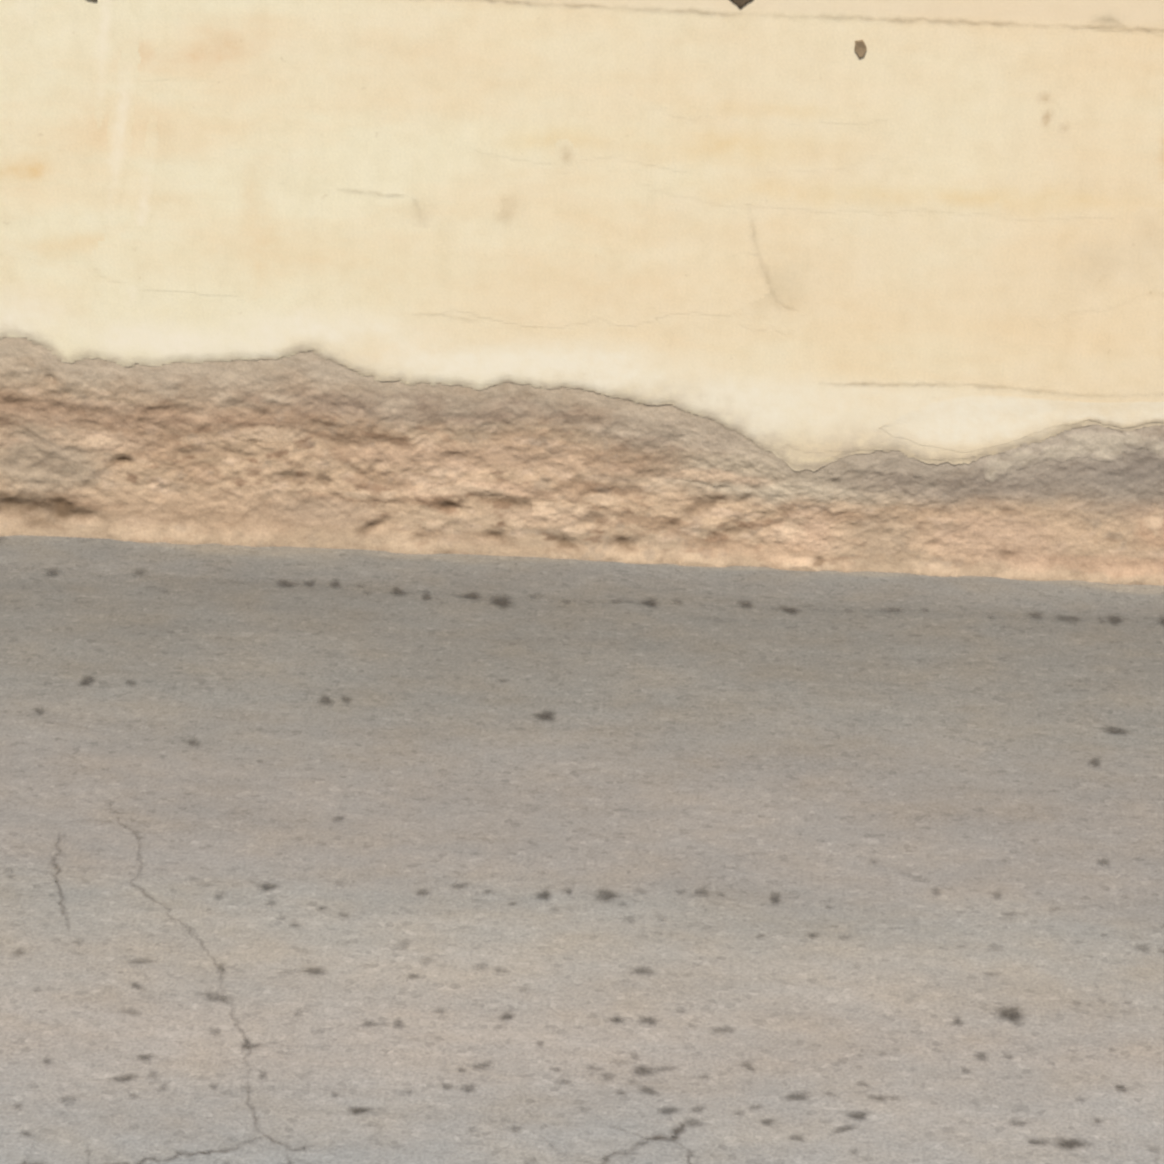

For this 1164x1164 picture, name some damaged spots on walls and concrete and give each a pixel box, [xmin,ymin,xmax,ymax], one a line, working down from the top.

flaking render [0,337,1164,586]